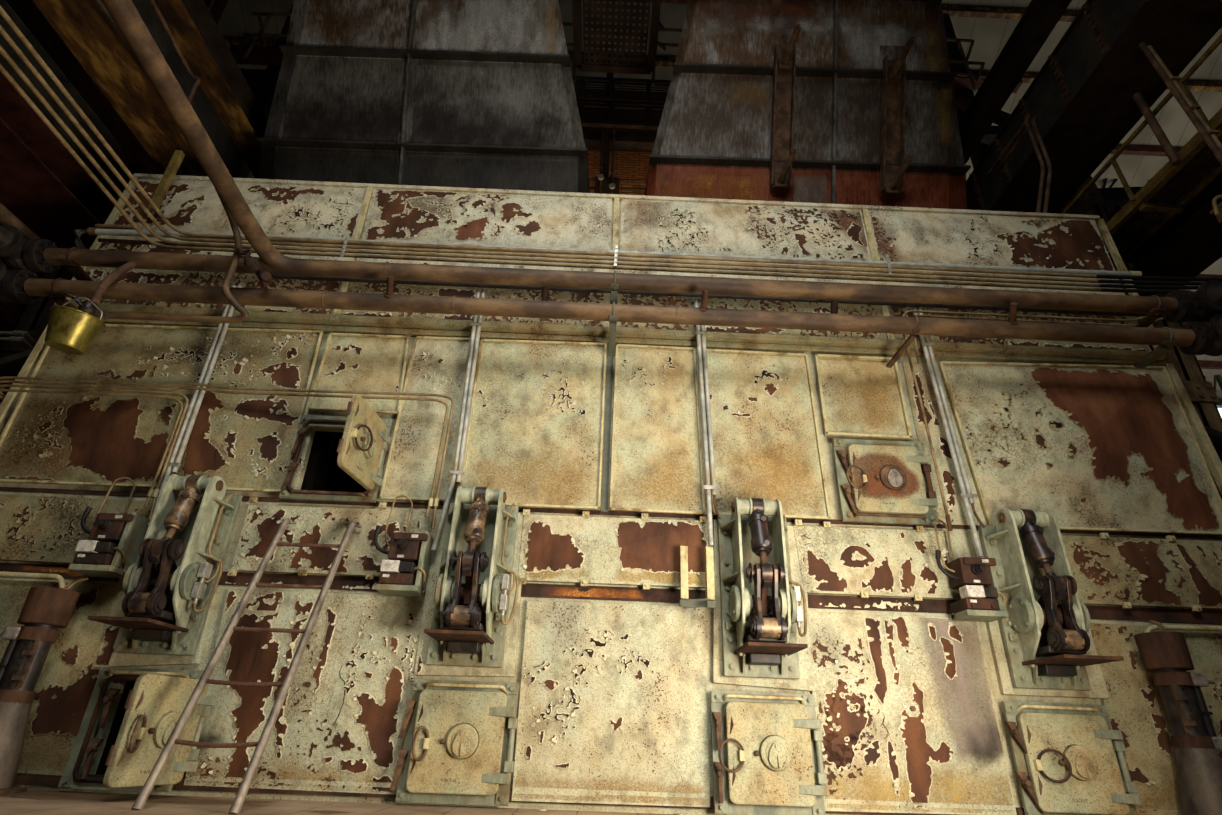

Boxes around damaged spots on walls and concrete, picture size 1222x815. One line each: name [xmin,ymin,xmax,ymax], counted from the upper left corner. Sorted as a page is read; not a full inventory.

peeling [346,189,542,241]
peeling [994,220,1115,271]
peeling [60,396,177,484]
peeling [180,346,301,476]
rust [854,454,918,498]
peeling [1030,367,1219,531]
peeling [241,509,421,589]
peeling [523,520,585,573]
peeling [615,521,708,575]
peeling [1070,539,1222,607]
peeling [222,582,337,787]
peeling [802,532,954,810]